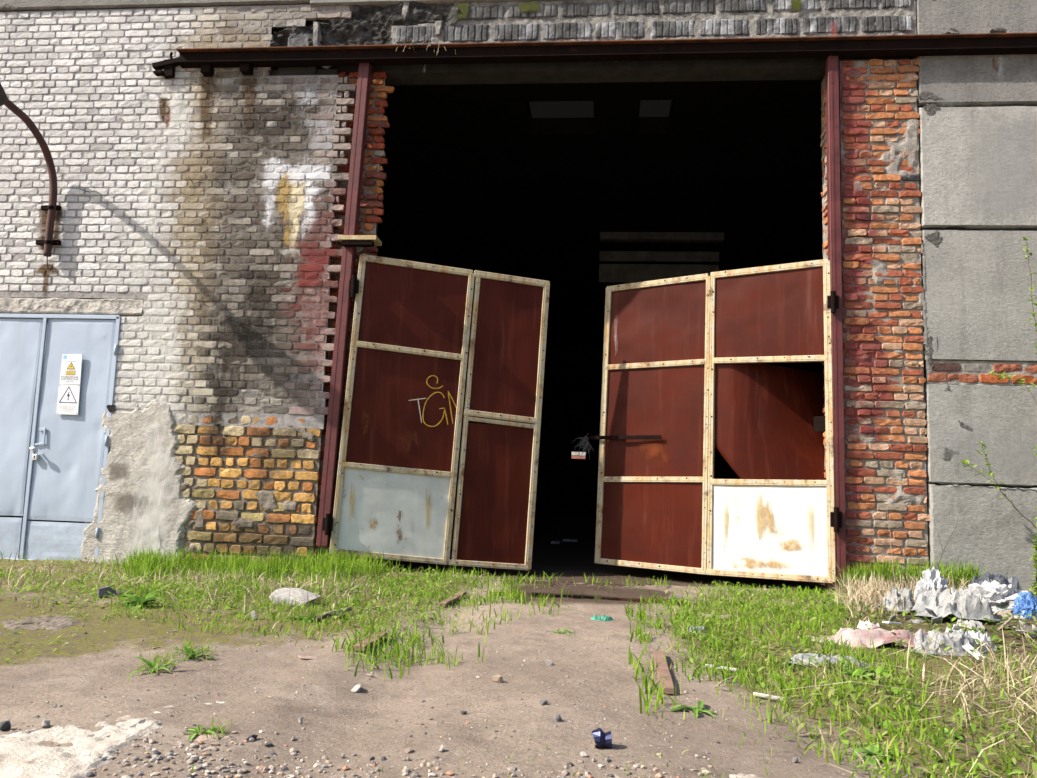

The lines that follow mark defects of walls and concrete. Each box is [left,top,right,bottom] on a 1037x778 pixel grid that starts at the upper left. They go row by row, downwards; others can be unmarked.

spalling [270,1,459,47]
rust [159,98,170,128]
leakage [242,78,256,135]
leakage [262,158,331,249]
rust [40,211,61,250]
rust [35,264,58,295]
leakage [242,272,281,341]
leakage [204,333,233,468]
flaking render [80,399,206,564]
flaking render [255,489,281,513]
rust [757,497,774,533]
rust [746,558,780,568]